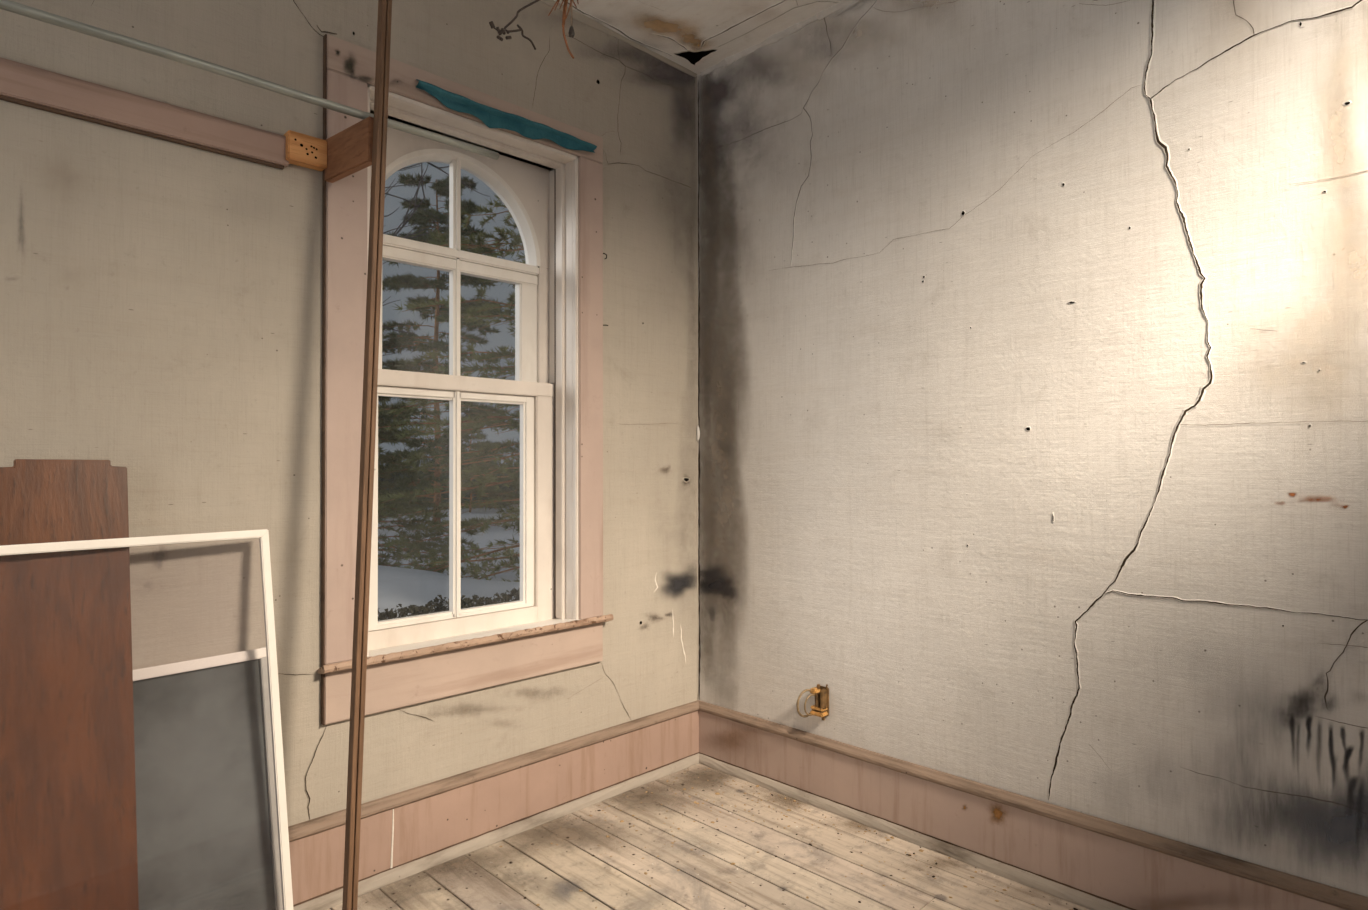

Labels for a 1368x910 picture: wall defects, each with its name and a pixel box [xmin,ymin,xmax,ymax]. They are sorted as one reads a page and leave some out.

water stain [620,51,743,604]
crack [532,0,1368,800]
water stain [1290,694,1312,746]
crack [1184,768,1368,815]
water stain [1280,728,1368,857]